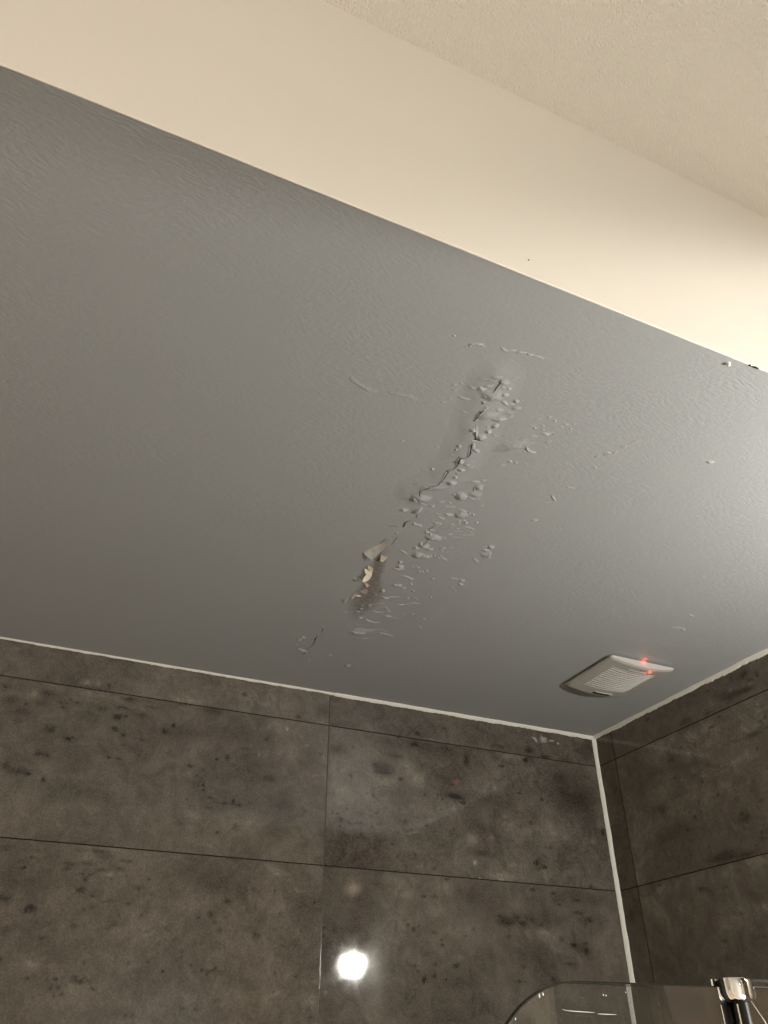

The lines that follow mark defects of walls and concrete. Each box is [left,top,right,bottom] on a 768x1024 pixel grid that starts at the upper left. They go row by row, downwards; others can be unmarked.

crack [391,381,501,545]
peeling [342,539,389,603]